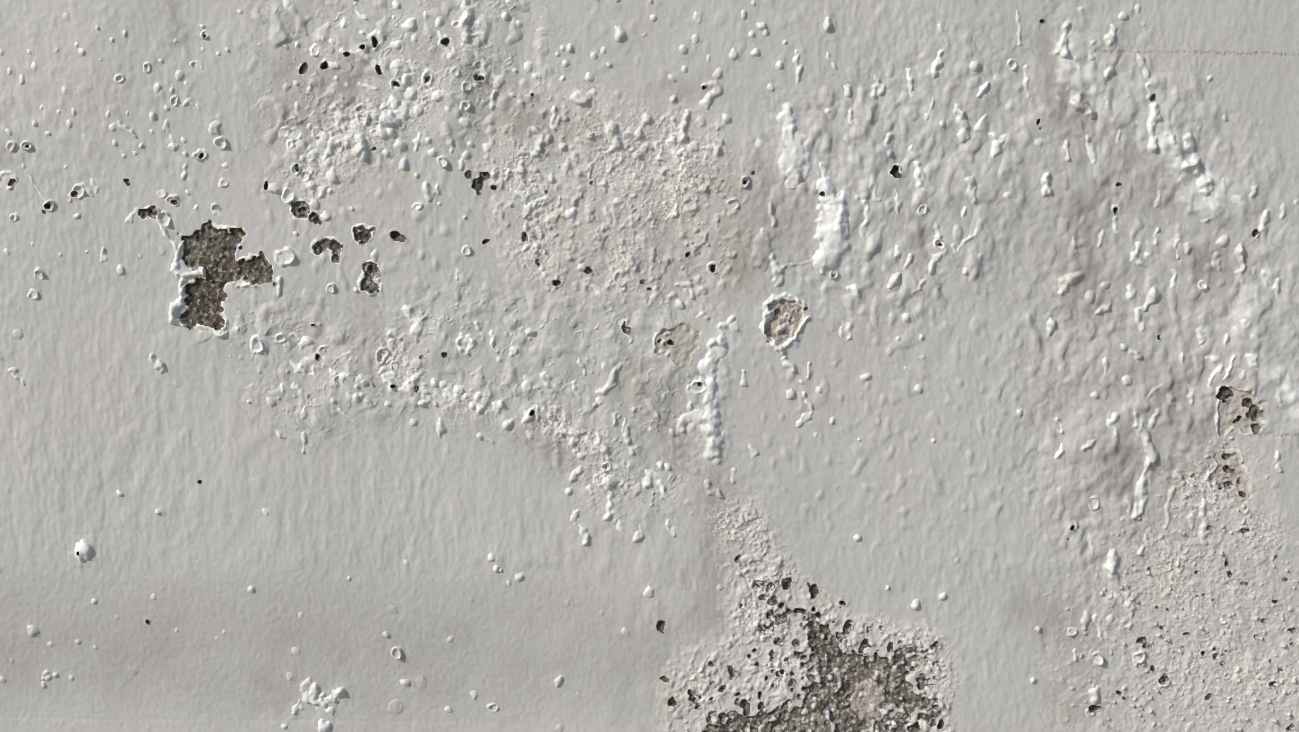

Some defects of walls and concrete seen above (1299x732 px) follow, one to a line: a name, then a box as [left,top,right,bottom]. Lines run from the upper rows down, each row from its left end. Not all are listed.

spalling [137,204,277,339]
spalling [310,222,384,297]
spalling [466,74,810,366]
peeling [987,0,1299,732]
spalling [655,494,962,732]